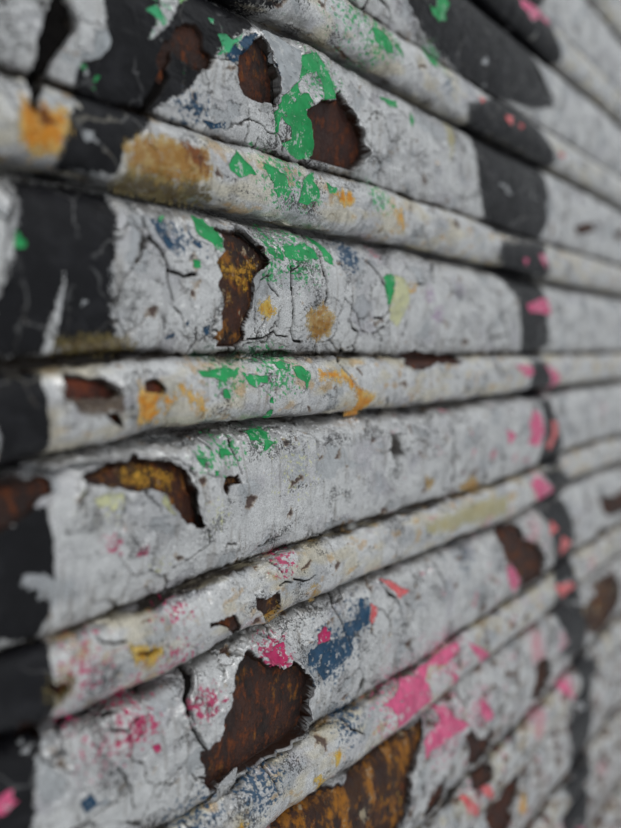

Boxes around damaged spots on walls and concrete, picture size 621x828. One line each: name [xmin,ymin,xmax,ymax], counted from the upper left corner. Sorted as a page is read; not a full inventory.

peeling [218,30,336,160]
crack [143,222,195,299]
corrosion [213,227,277,344]
crack [235,232,265,259]
crack [242,266,301,343]
peeling [19,443,205,471]
corrosion [83,457,208,533]
peeling [308,597,378,681]
crack [49,711,139,759]
peeling [192,666,231,750]
corrosion [200,655,317,785]
corrosion [270,715,425,828]